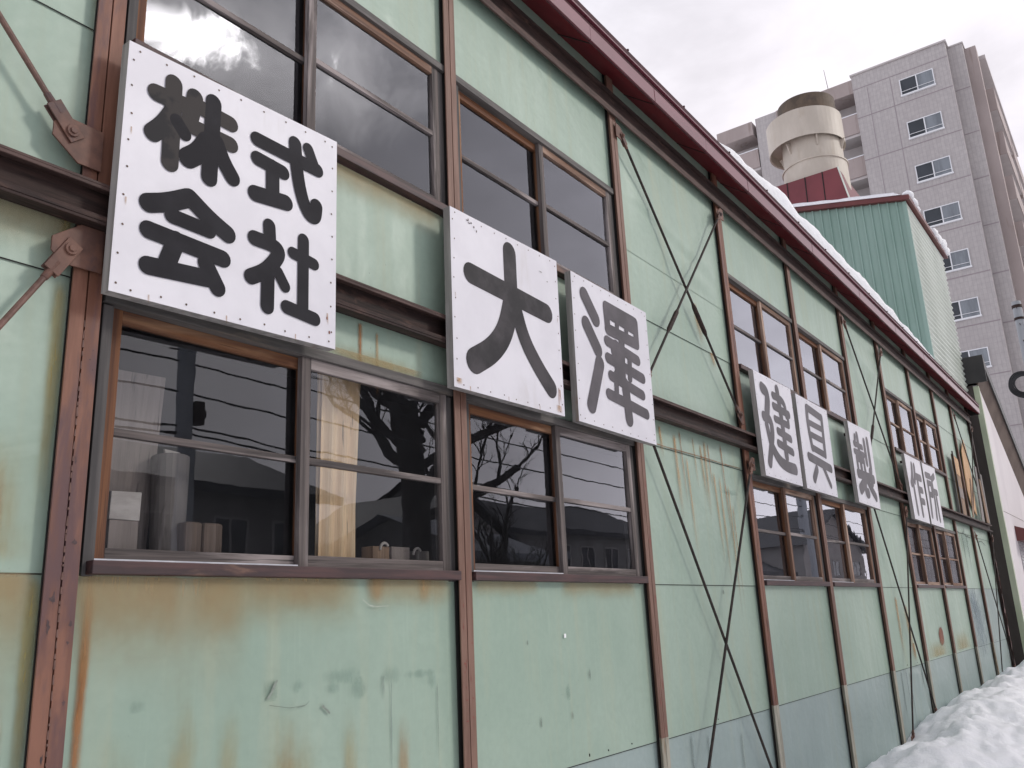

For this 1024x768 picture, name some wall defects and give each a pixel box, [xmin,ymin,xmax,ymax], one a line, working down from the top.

rust [71,580,93,768]